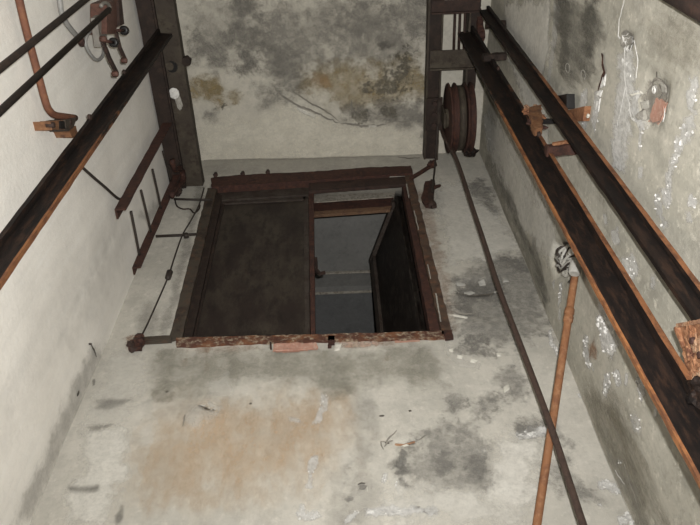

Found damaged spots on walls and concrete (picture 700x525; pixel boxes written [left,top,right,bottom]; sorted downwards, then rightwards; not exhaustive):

water stain [244,2,426,127]
crack [272,84,414,128]
water stain [610,50,644,171]
water stain [654,77,699,228]